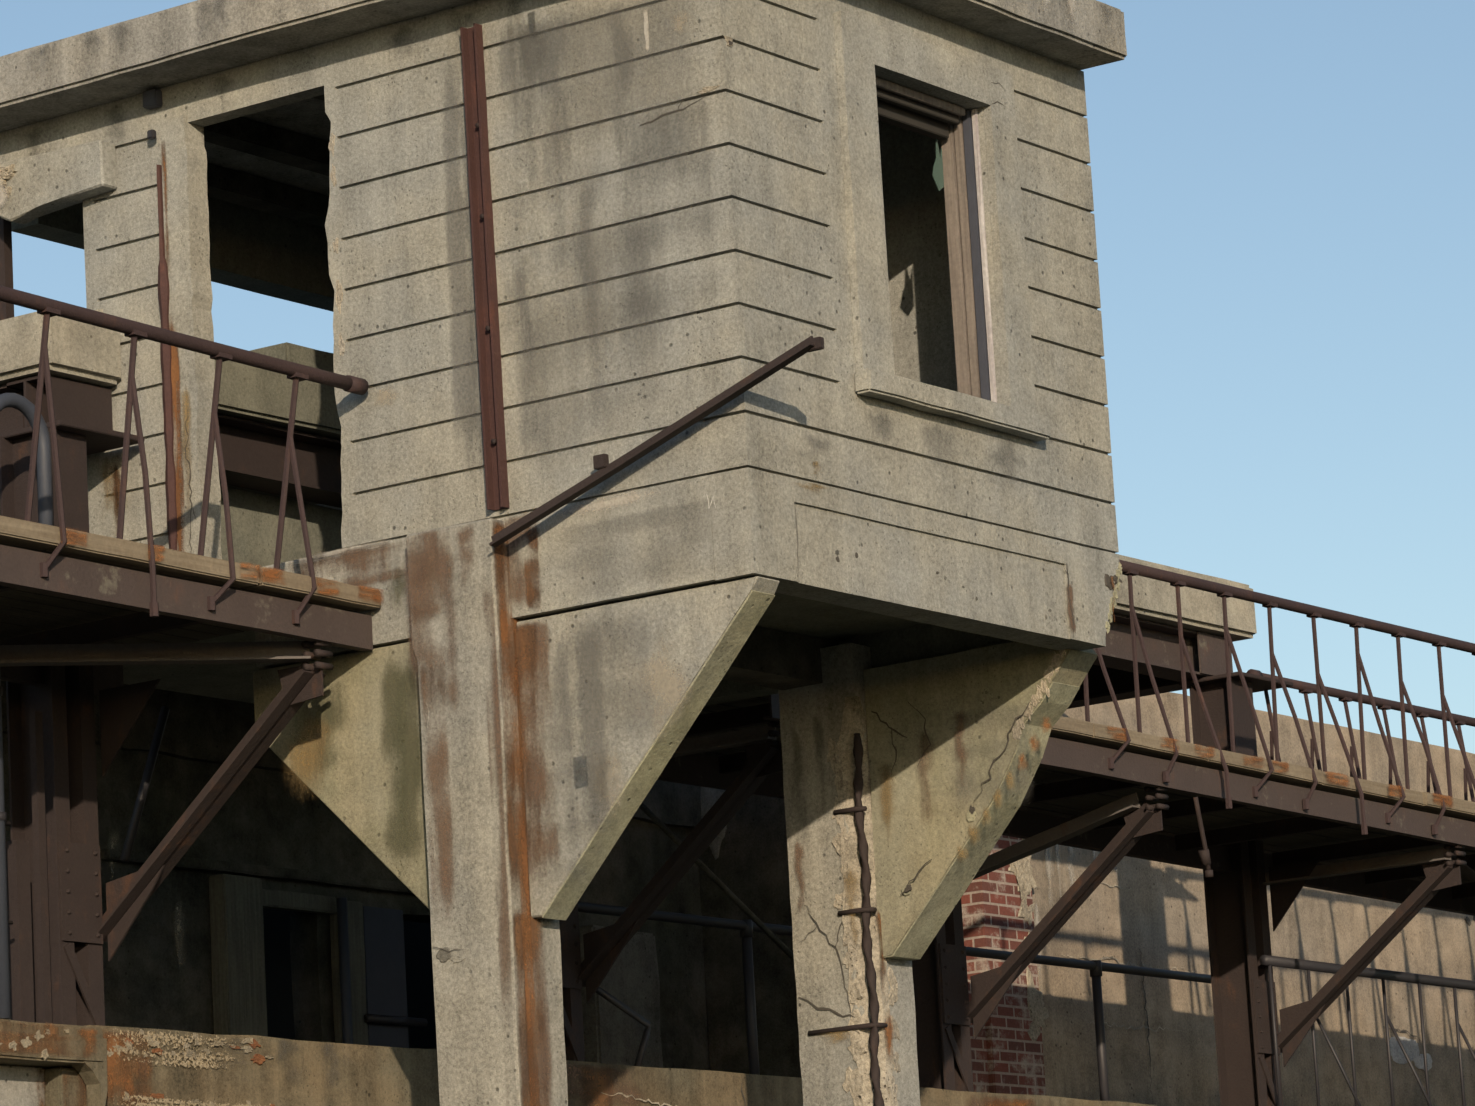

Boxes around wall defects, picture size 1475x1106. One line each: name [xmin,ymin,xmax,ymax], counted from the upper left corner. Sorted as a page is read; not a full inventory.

spalling [0,164,18,205]
spalling [328,133,337,187]
corrosion [241,528,471,704]
crack [871,702,931,775]
crack [974,702,1030,801]
corrosion [428,738,452,900]
spalling [808,696,901,1106]
corrosion [0,1022,151,1106]
peeling [107,1028,274,1070]
peeling [112,1091,275,1106]